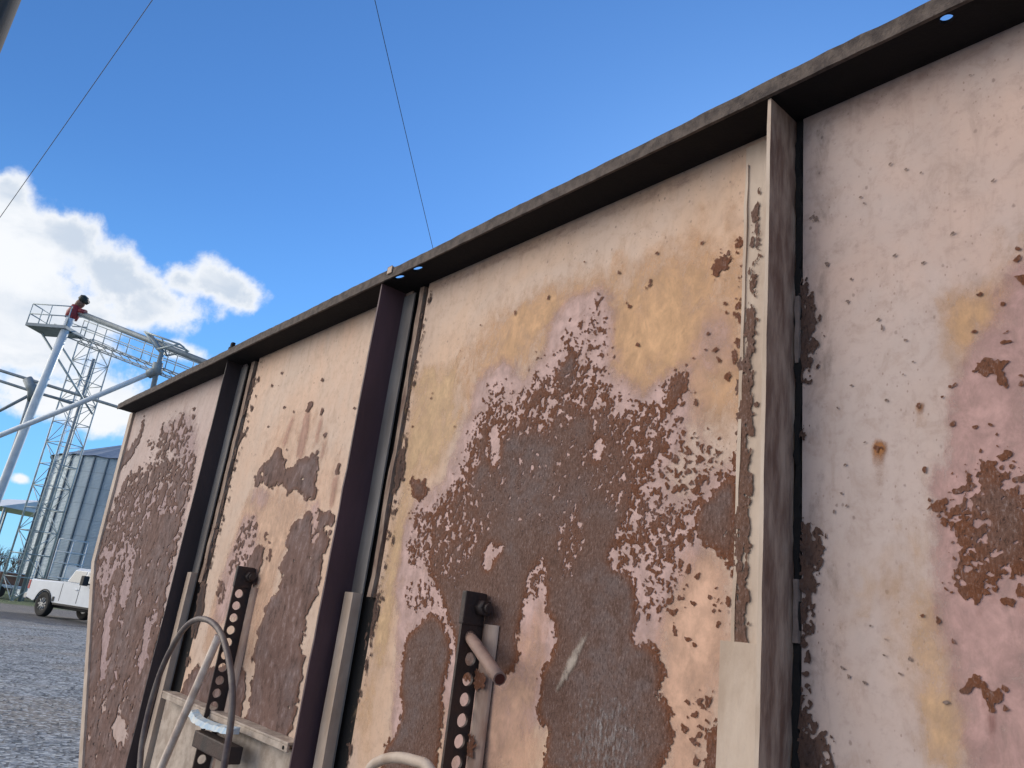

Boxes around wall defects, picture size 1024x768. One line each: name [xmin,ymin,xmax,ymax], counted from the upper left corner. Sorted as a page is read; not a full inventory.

peeling [96,417,196,699]
peeling [216,517,257,621]
corrosion [364,187,762,768]
peeling [391,289,736,768]
corrosion [794,277,825,384]
corrosion [792,517,835,768]
corrosion [863,441,886,458]
peeling [930,264,1024,768]